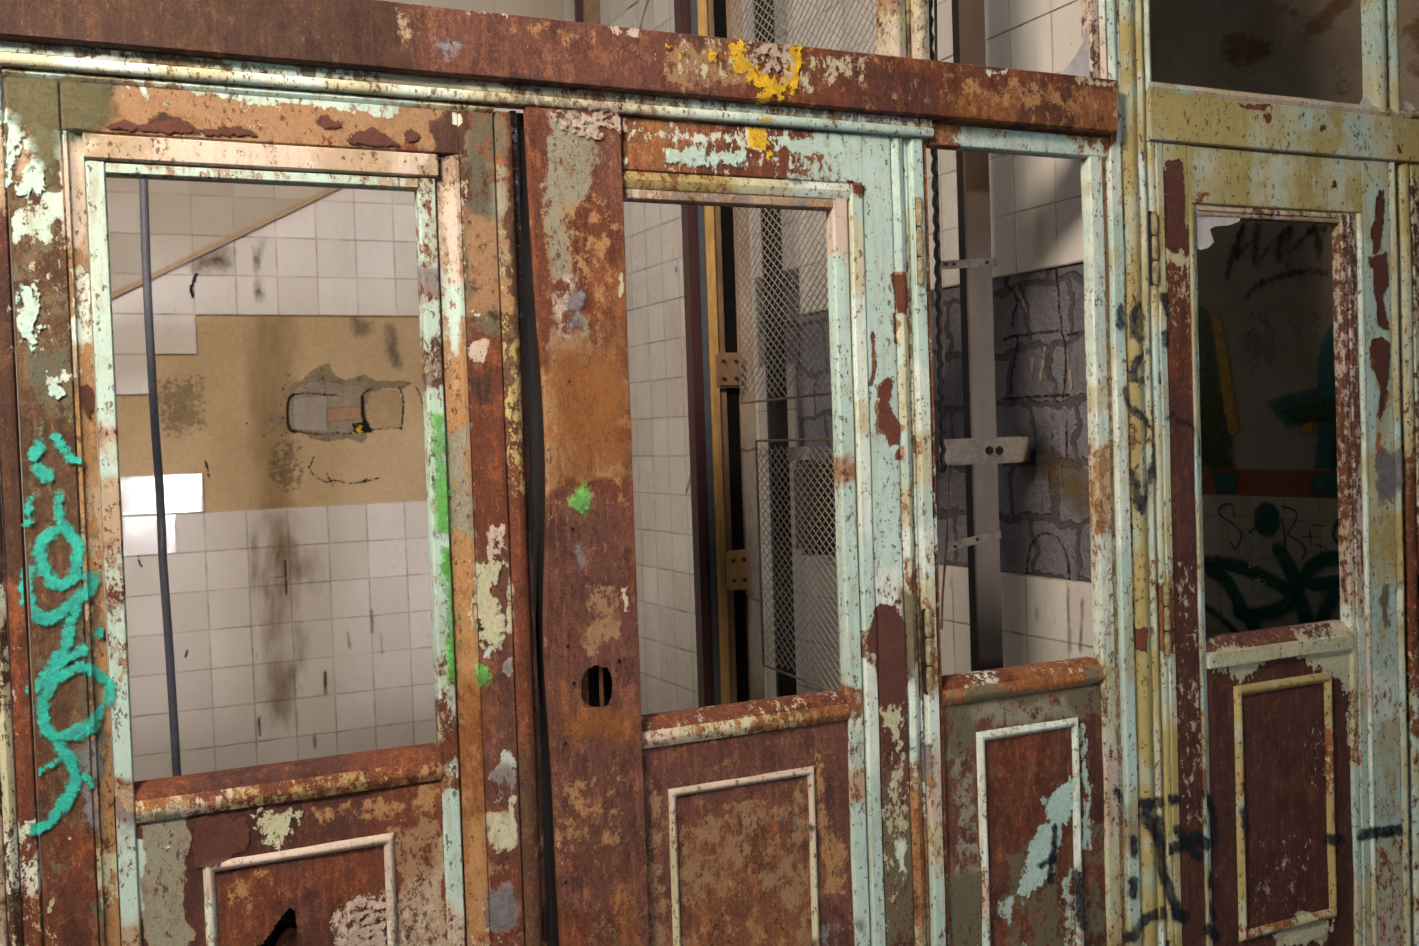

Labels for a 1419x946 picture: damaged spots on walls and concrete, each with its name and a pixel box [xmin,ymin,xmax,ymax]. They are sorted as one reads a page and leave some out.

peeling [0,113,46,208]
rust [107,117,257,137]
rust [1164,159,1185,249]
peeling [15,280,46,352]
rust [1372,189,1391,420]
peeling [47,368,66,400]
flaking render [267,364,412,443]
rust [868,604,908,753]
peeling [1017,776,1080,905]
peeling [334,890,399,946]